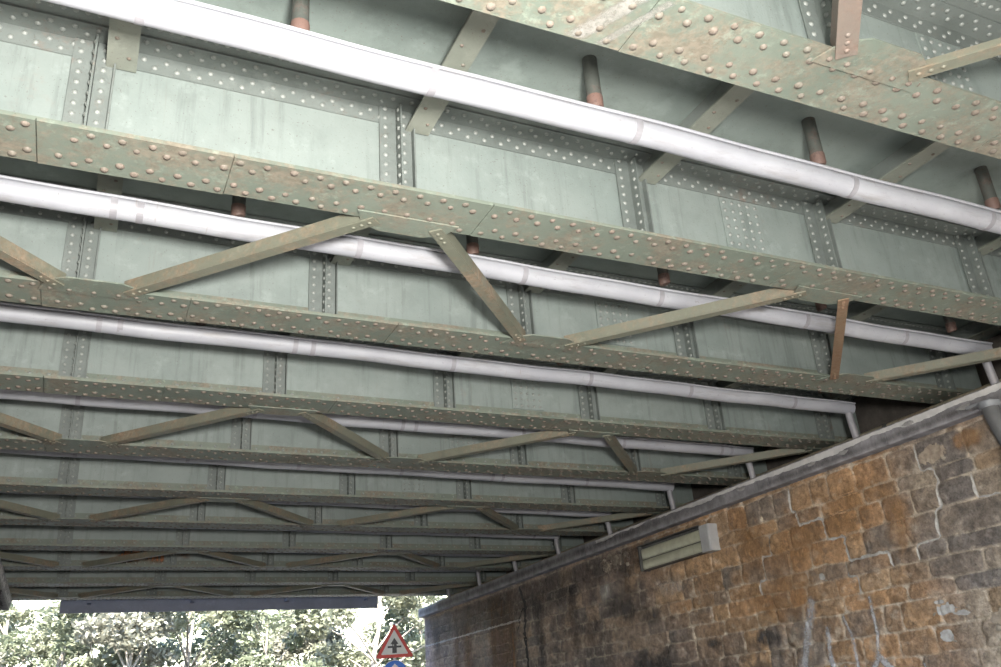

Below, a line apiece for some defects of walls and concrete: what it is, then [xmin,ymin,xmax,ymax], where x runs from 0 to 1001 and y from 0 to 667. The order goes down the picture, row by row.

crack [517,587,529,667]
damp [757,631,779,645]